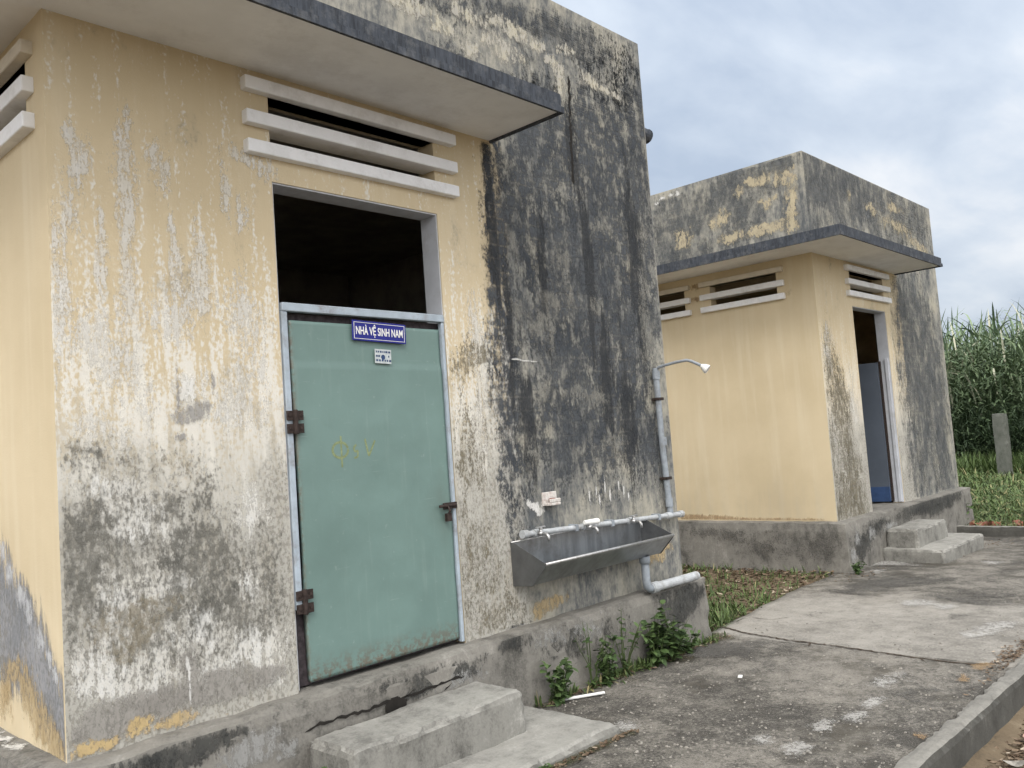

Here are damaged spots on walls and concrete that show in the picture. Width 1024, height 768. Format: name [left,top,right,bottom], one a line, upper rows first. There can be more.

peeling [51,104,293,704]
damp [374,0,927,700]
damp [823,274,962,563]
damp [0,439,287,762]
damp [111,714,297,768]
crack [306,676,464,732]
damp [829,575,1014,605]